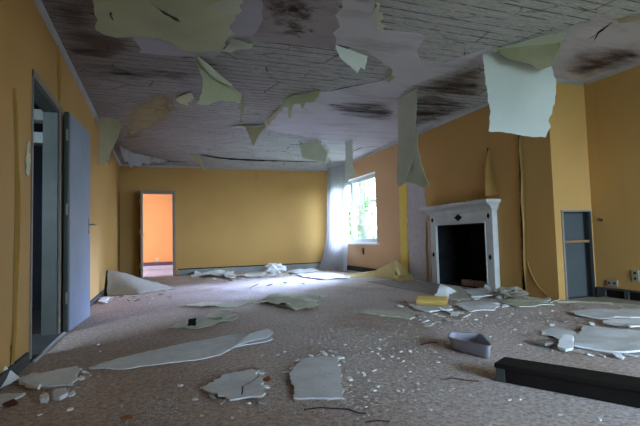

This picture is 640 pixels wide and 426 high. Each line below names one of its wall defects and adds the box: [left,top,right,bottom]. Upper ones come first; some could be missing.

leakage [581,50,635,71]
leakage [329,101,390,117]
leakage [416,71,476,126]
crack [167,154,310,163]